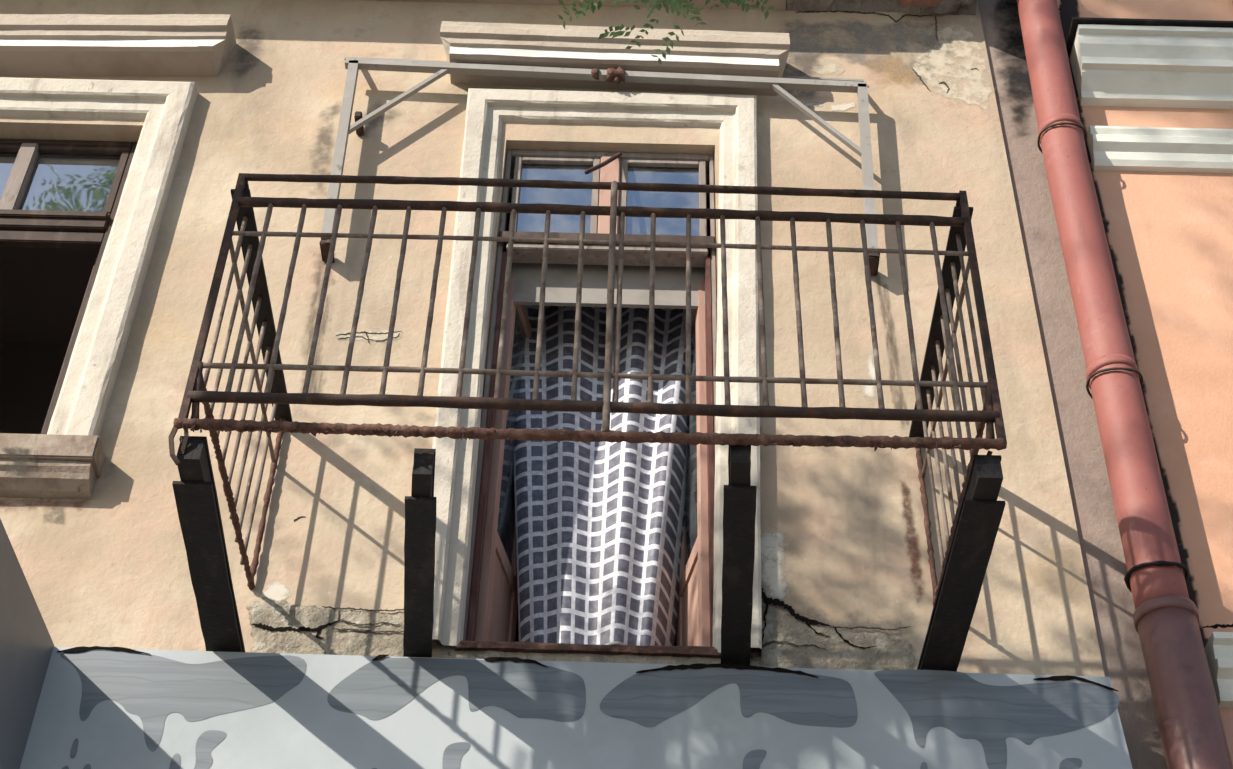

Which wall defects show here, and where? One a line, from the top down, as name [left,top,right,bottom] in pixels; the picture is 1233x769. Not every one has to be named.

flaking render [812,59,844,74]
flaking render [897,0,992,115]
flaking render [805,102,855,111]
corrosion [902,485,922,595]
spalling [246,583,404,657]
spalling [432,642,721,665]
spalling [750,532,914,670]
crack [753,585,911,650]